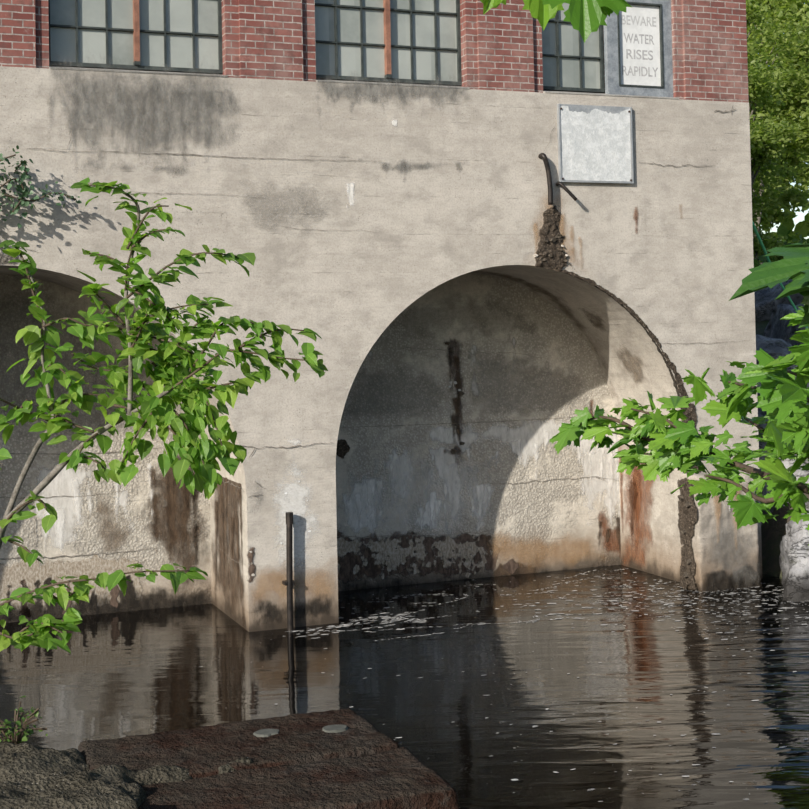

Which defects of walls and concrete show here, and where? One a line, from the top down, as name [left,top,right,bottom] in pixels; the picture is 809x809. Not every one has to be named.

leakage [69,74,231,149]
leakage [0,464,245,628]
spalling [336,439,350,458]
efflorescence [343,450,413,533]
peeling [337,531,536,584]
rust [444,340,465,464]
efflorescence [416,420,562,531]
rust [598,458,653,564]